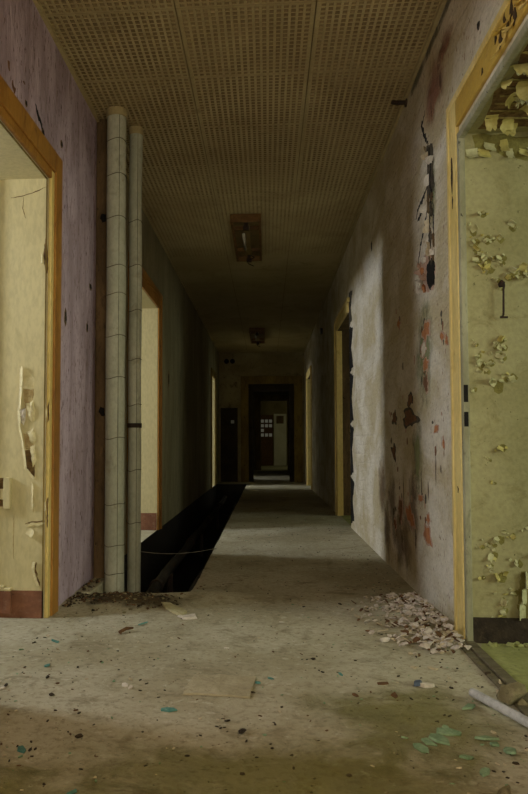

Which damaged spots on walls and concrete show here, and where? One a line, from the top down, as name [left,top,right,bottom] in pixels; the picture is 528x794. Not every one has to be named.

peeling [466,45,528,161]
flaking render [413,255,436,295]
peeling [468,211,528,291]
flaking render [414,311,449,395]
peeling [473,335,518,394]
flaking render [389,388,420,444]
flaking render [393,486,433,548]
peeling [476,525,528,621]